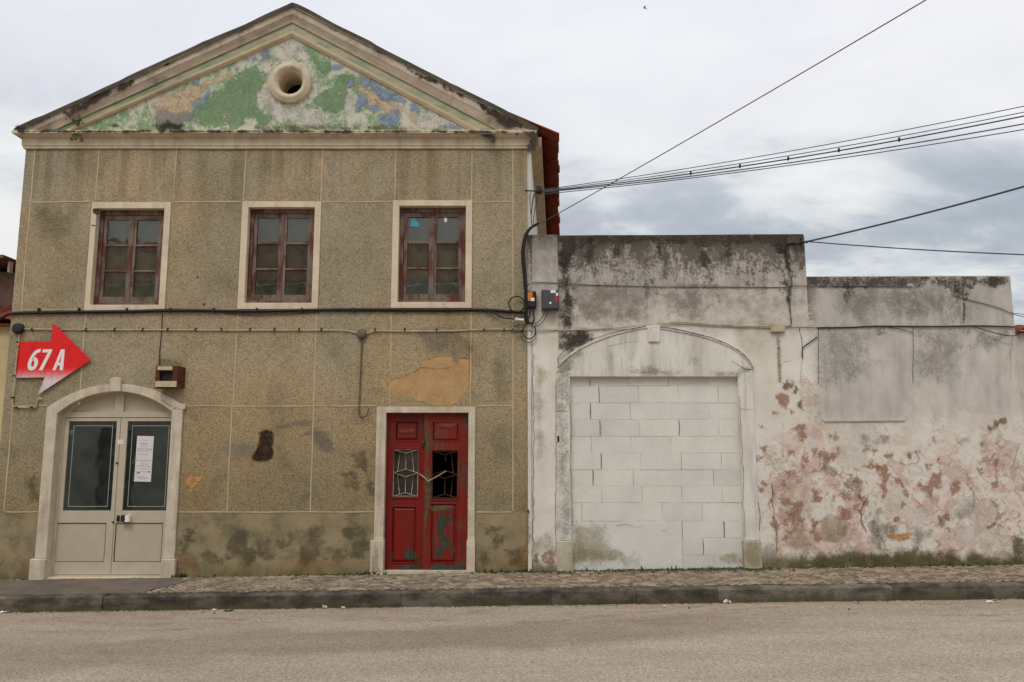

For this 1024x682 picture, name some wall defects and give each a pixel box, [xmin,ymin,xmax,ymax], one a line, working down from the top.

peeling [151,39,461,130]
damp [558,235,791,371]
damp [807,277,1007,323]
peeling [379,354,472,457]
peeling [390,471,465,570]
crack [703,396,778,562]
peeling [772,379,818,441]
peeling [758,432,839,544]
peeling [863,448,974,541]
peeling [988,418,1007,465]
peeling [1013,537,1024,555]